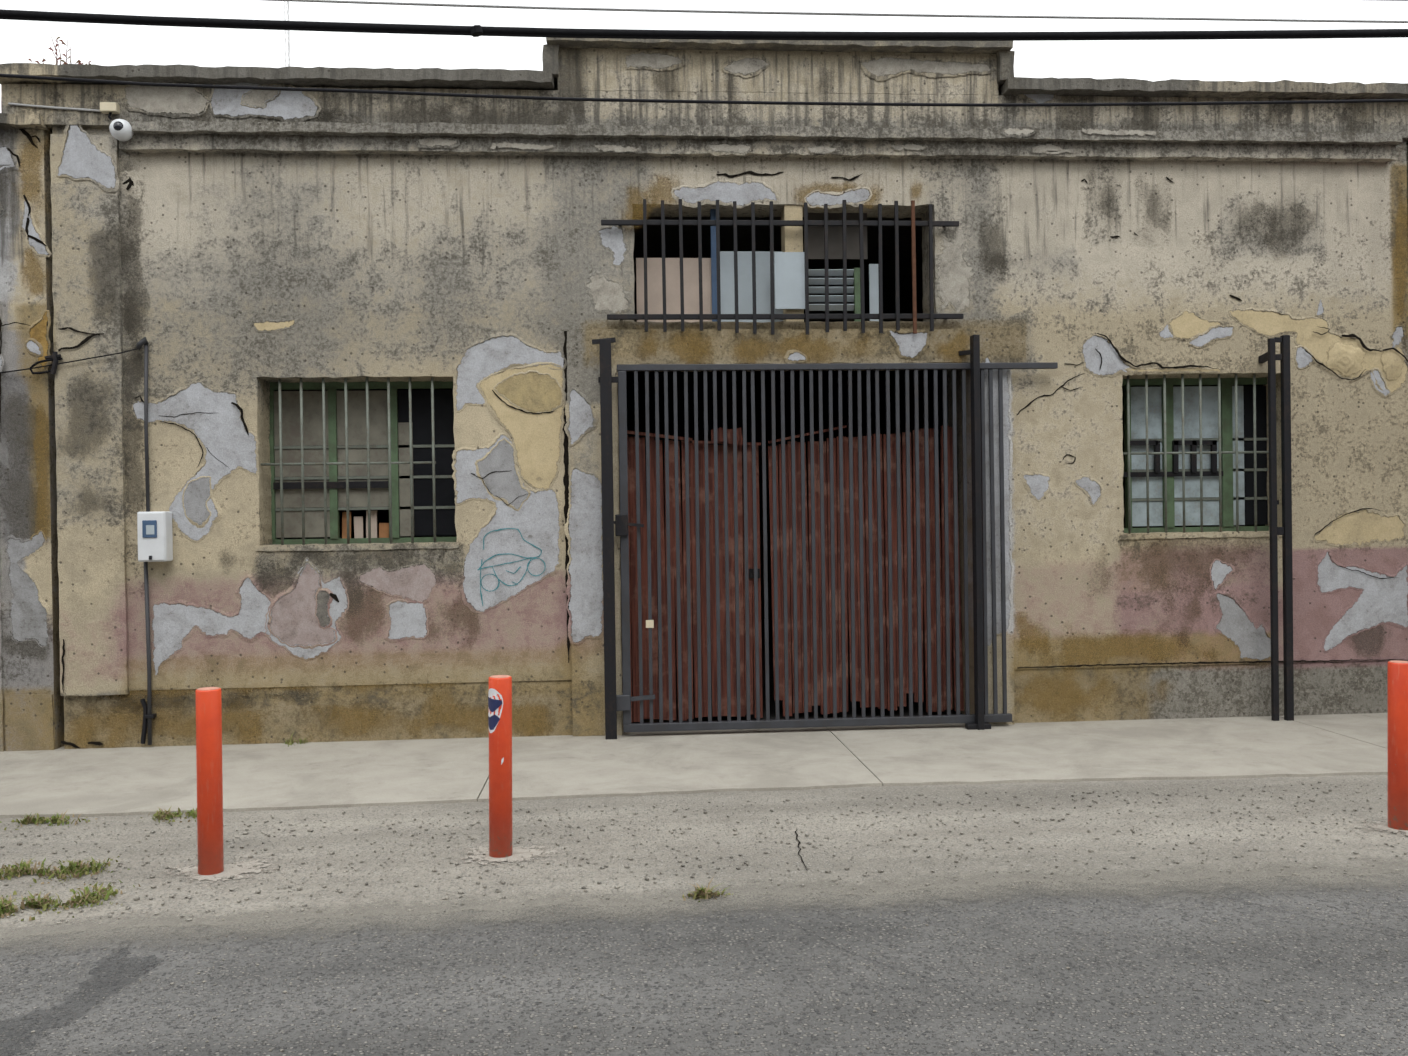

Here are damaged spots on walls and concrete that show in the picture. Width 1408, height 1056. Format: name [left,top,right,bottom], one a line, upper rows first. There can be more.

peeling [123,83,322,122]
peeling [0,199,52,257]
peeling [56,125,119,193]
peeling [671,179,779,208]
peeling [804,186,873,209]
leakage [4,197,147,538]
peeling [1079,333,1222,378]
peeling [1155,298,1408,399]
peeling [131,381,259,543]
peeling [452,332,604,645]
peeling [150,557,439,677]
peeling [1313,506,1408,653]